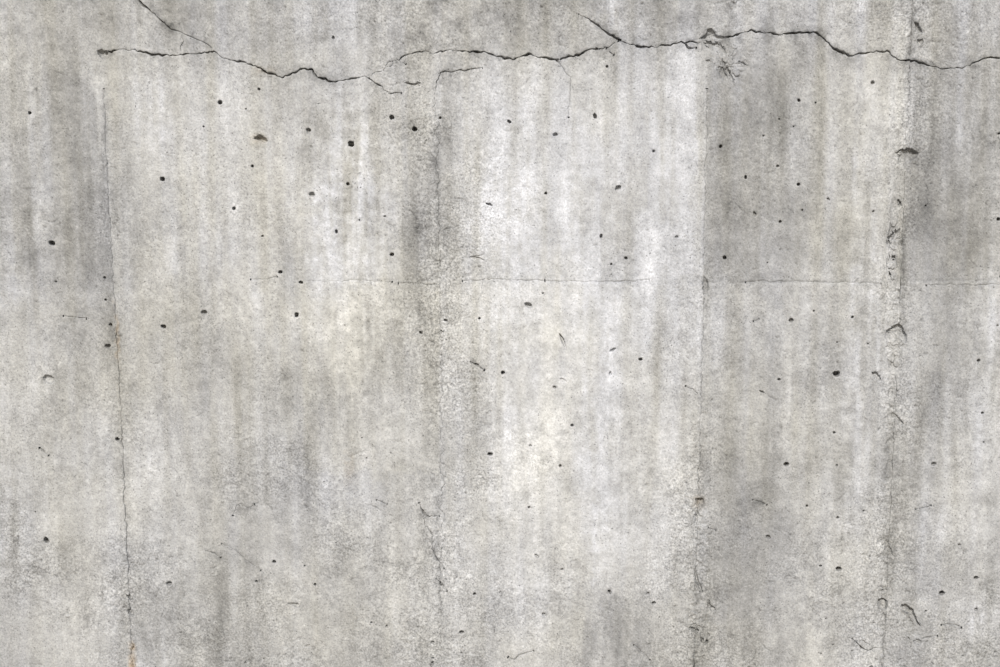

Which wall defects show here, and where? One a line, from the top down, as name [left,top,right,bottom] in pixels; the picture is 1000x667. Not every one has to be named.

crack [95,0,1000,117]